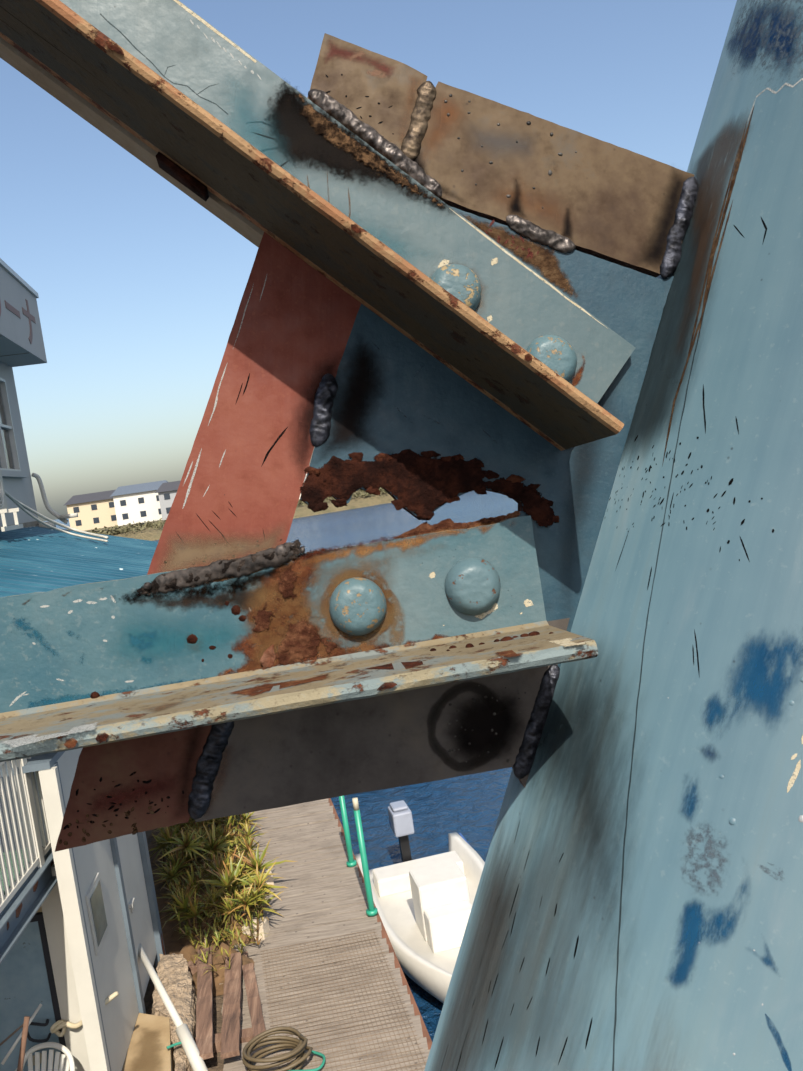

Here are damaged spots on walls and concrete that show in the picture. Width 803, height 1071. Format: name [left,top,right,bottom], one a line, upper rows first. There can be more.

corrosion [105,41,124,55]
crack [100,13,227,114]
corrosion [139,449,559,676]
corrosion [231,674,328,696]
corrosion [367,661,423,691]